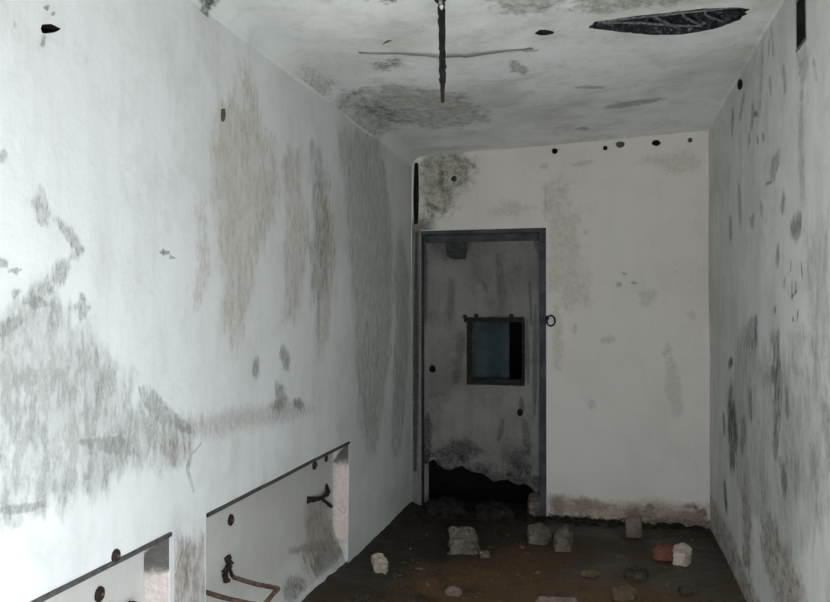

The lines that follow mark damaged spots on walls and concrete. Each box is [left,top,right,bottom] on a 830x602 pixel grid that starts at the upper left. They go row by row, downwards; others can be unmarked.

spalling [579,0,762,46]
damp [412,154,474,505]
damp [723,385,736,468]